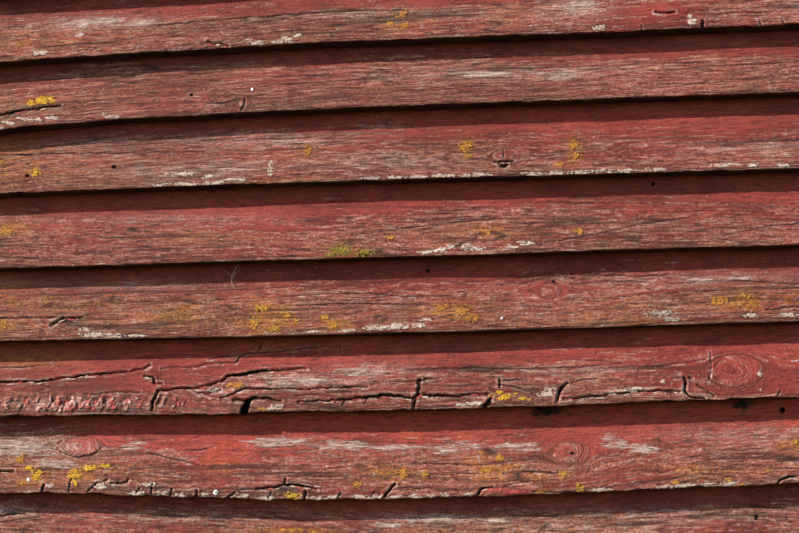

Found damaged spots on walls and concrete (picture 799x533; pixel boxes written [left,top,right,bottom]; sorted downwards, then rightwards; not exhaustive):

crack [0,104,61,117]
crack [0,344,715,410]
crack [227,478,318,499]